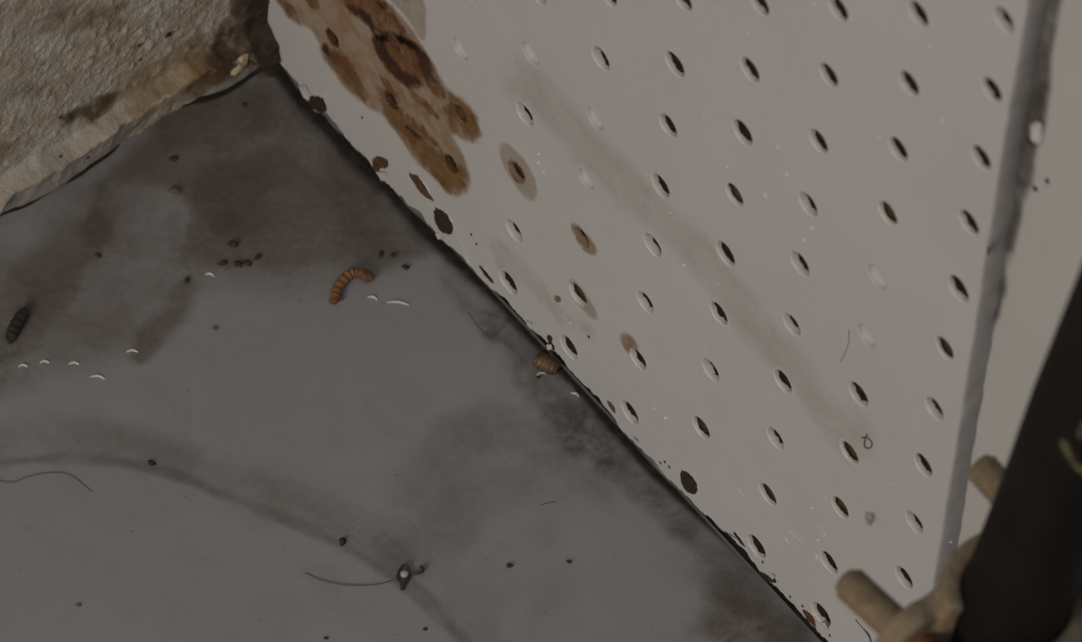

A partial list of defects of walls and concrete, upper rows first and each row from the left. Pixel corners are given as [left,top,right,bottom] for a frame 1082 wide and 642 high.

damp [64,96,115,123]
rust [277,0,478,195]